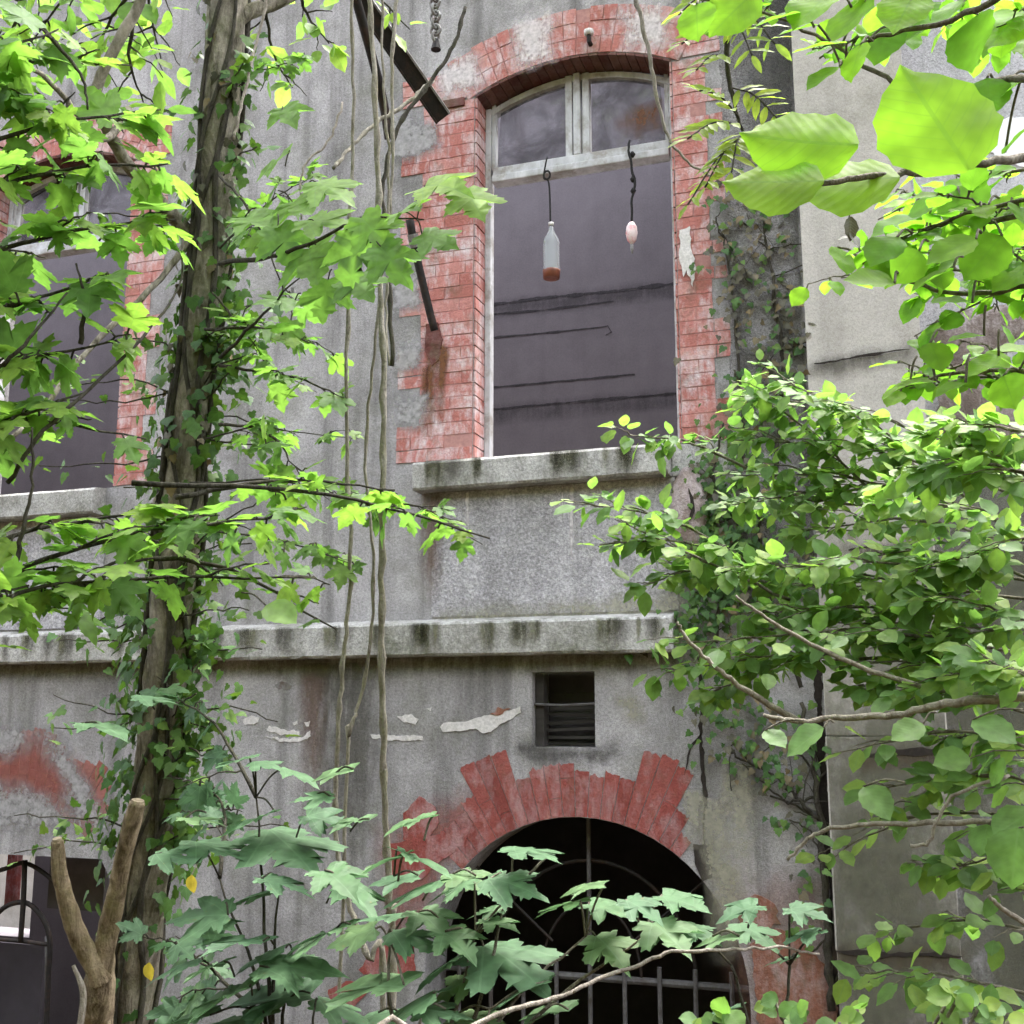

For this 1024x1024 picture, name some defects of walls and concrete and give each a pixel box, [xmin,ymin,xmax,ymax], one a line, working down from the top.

peeling [679,226,696,287]
corrosion [422,322,448,410]
damp [425,459,459,479]
damp [473,457,481,477]
damp [550,450,580,470]
damp [603,446,636,466]
damp [552,596,679,638]
damp [0,634,92,677]
damp [411,610,540,670]
peeling [370,714,423,741]
peeling [440,706,521,733]
flaking render [0,724,106,834]